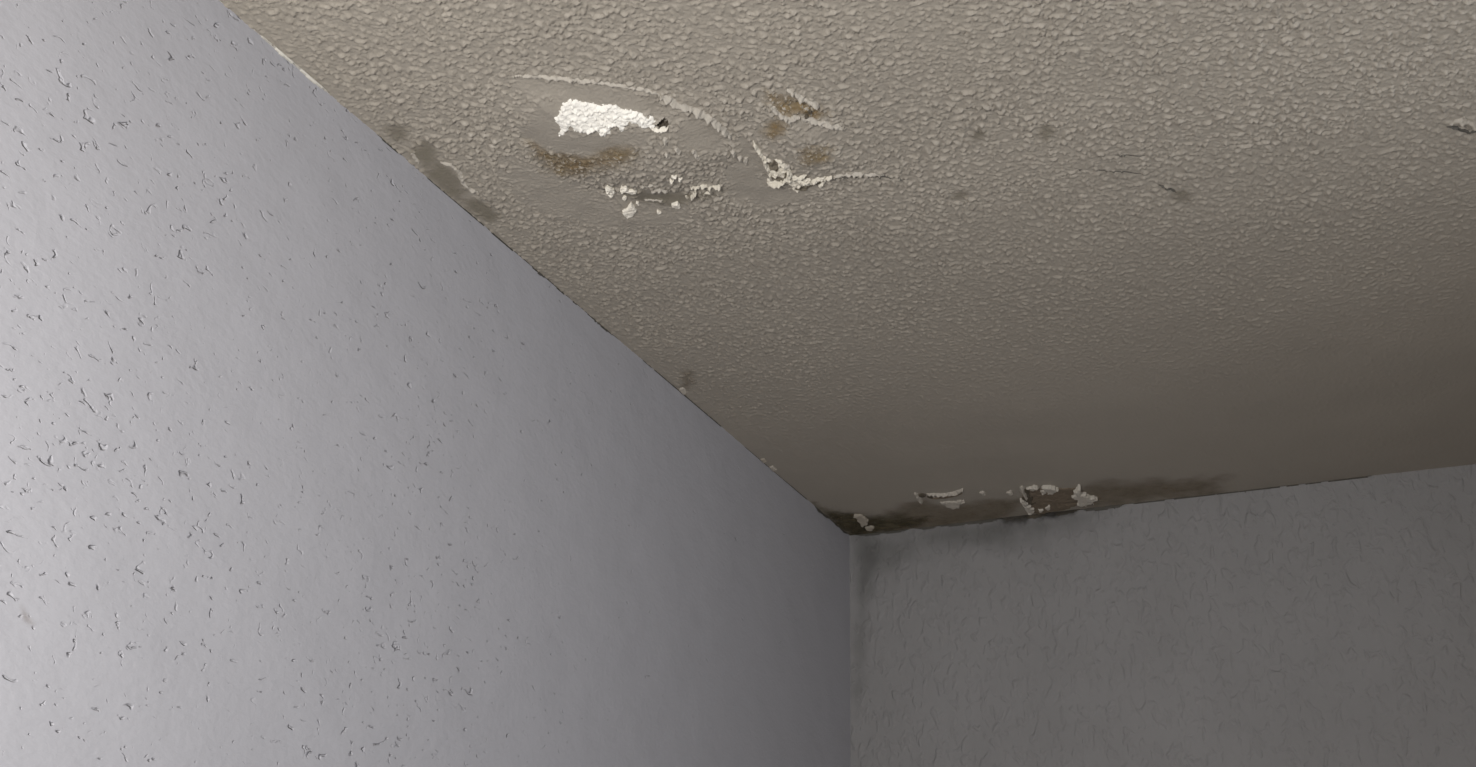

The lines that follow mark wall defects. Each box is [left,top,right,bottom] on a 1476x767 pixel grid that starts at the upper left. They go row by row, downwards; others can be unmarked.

peeling [512,74,832,219]
peeling [914,488,986,510]
flaking render [1006,484,1098,515]
peeling [853,513,874,531]